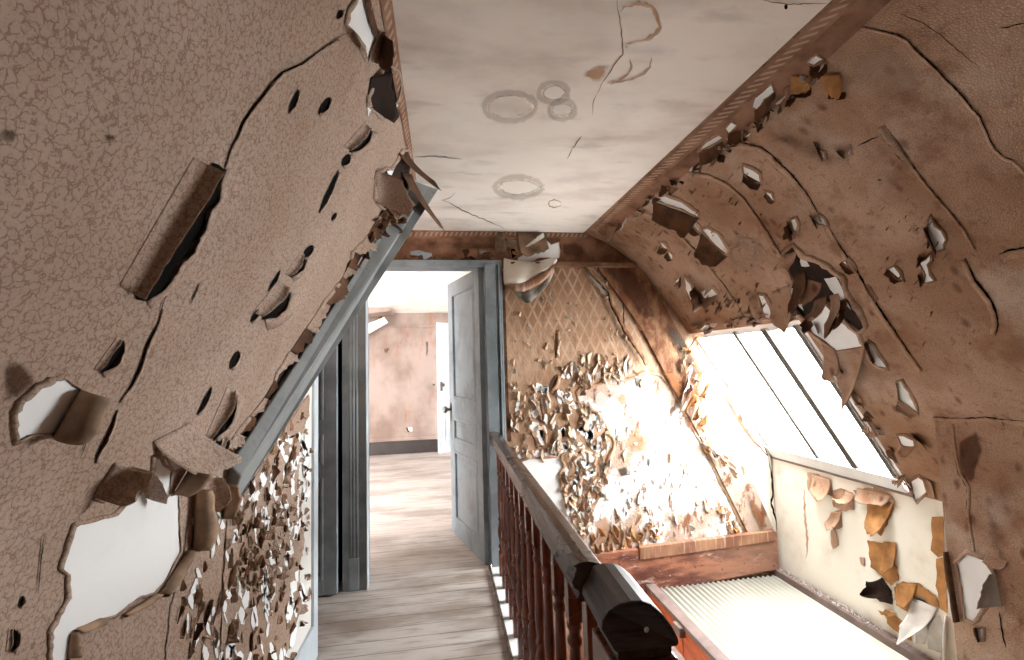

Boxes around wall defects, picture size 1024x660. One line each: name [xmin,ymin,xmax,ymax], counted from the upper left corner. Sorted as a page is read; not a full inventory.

water stain [499,181,538,195]
water stain [544,86,571,115]
crack [593,6,624,103]
peeling [615,64,824,233]
crack [860,12,1024,175]
peeling [701,282,767,315]
flaking render [510,303,746,554]
peeling [177,412,314,660]